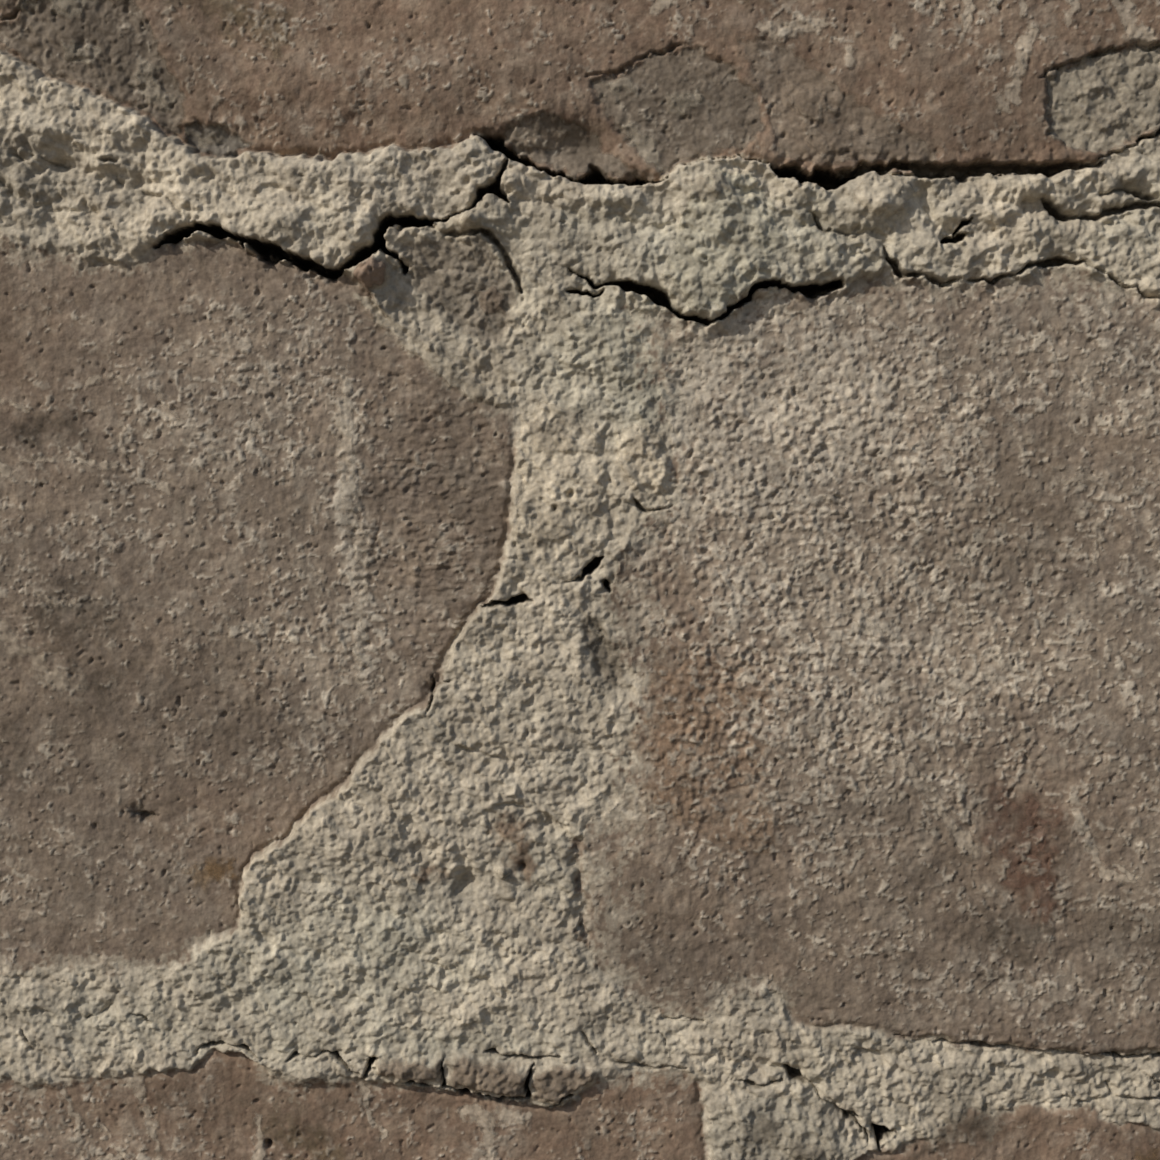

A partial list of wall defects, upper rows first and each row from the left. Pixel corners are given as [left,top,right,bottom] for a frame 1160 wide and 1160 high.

crack [1136,129,1160,143]
crack [770,162,1160,221]
crack [155,137,668,286]
crack [940,220,970,244]
crack [885,256,1083,287]
crack [567,271,842,326]
crack [577,556,610,591]
crack [482,593,533,607]
crack [333,1051,376,1077]
crack [407,1056,541,1098]
crack [784,1064,806,1082]
crack [843,1109,866,1129]